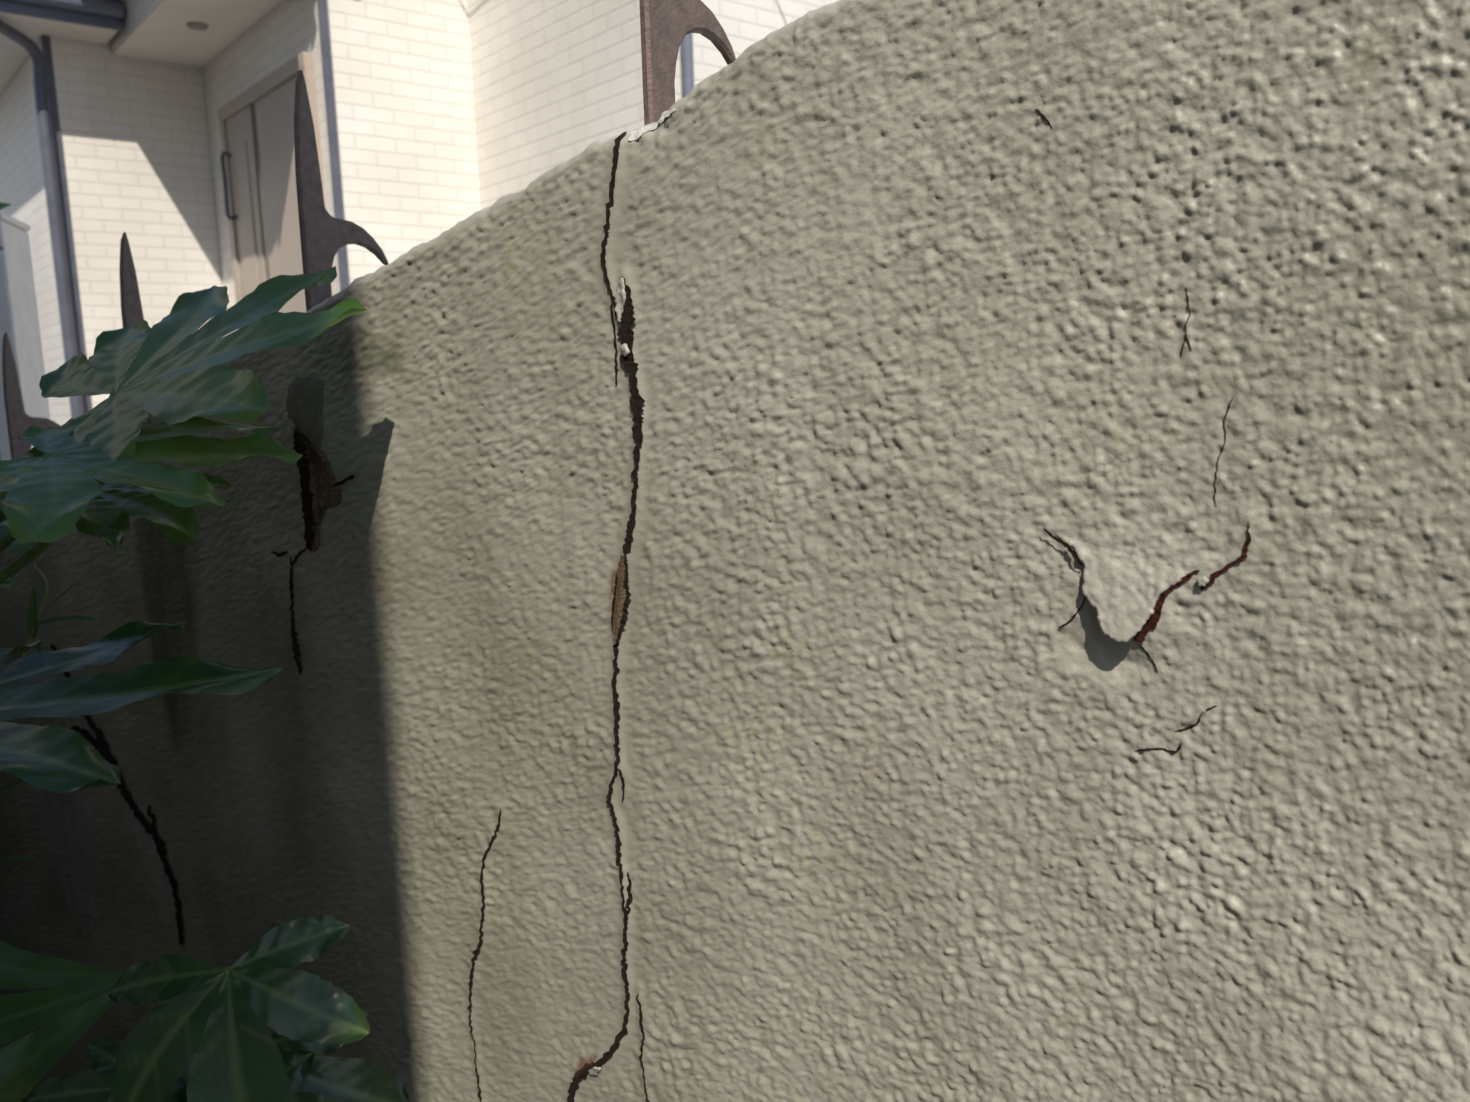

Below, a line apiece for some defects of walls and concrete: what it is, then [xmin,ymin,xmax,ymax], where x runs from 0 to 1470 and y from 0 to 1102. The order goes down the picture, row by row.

spalling [293,427,355,552]
crack [50,644,71,677]
crack [289,548,307,675]
crack [567,132,650,1102]
peeling [1043,521,1251,672]
crack [70,715,184,945]
crack [467,808,501,1102]